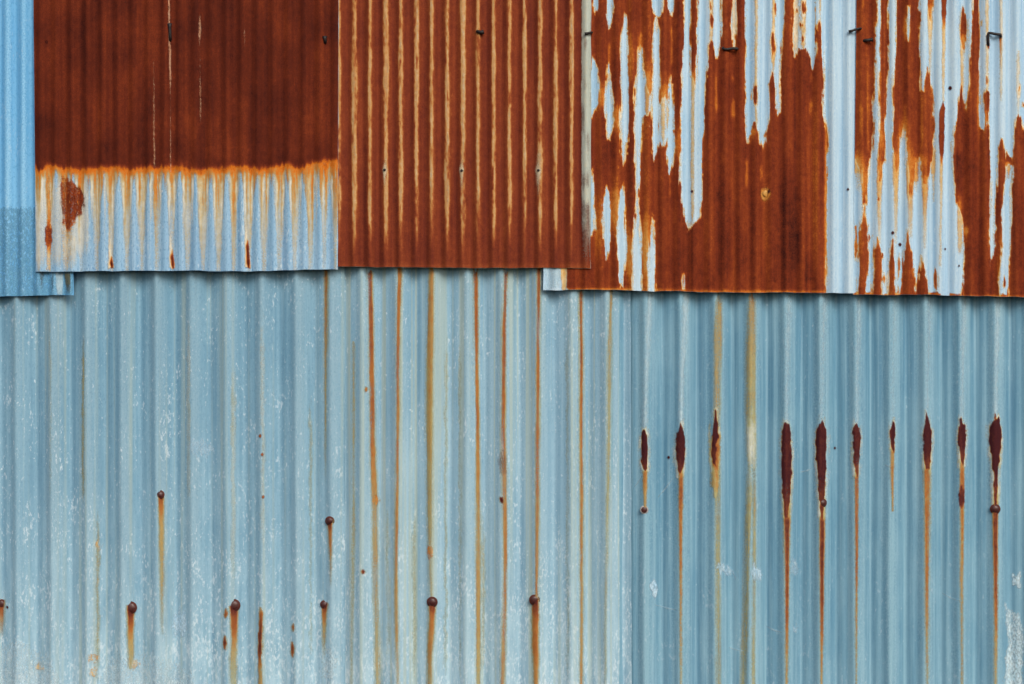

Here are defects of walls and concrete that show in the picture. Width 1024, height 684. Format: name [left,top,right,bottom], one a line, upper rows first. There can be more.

corrosion [853,0,1024,297]
corrosion [33,0,830,684]
corrosion [851,423,862,681]
corrosion [922,410,934,683]
corrosion [956,417,967,684]
corrosion [988,414,1003,684]